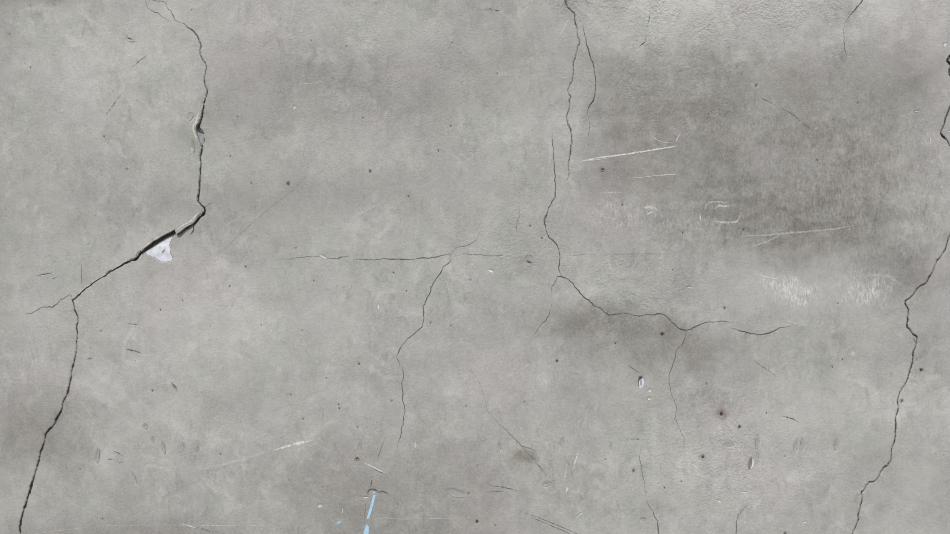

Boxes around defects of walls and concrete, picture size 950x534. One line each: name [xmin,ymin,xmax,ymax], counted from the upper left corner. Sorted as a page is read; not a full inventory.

crack [146,0,208,122]
crack [19,251,143,533]
spalling [139,230,178,262]
crack [179,150,216,235]
crack [275,239,502,460]
crack [531,1,790,436]
crack [853,236,950,531]